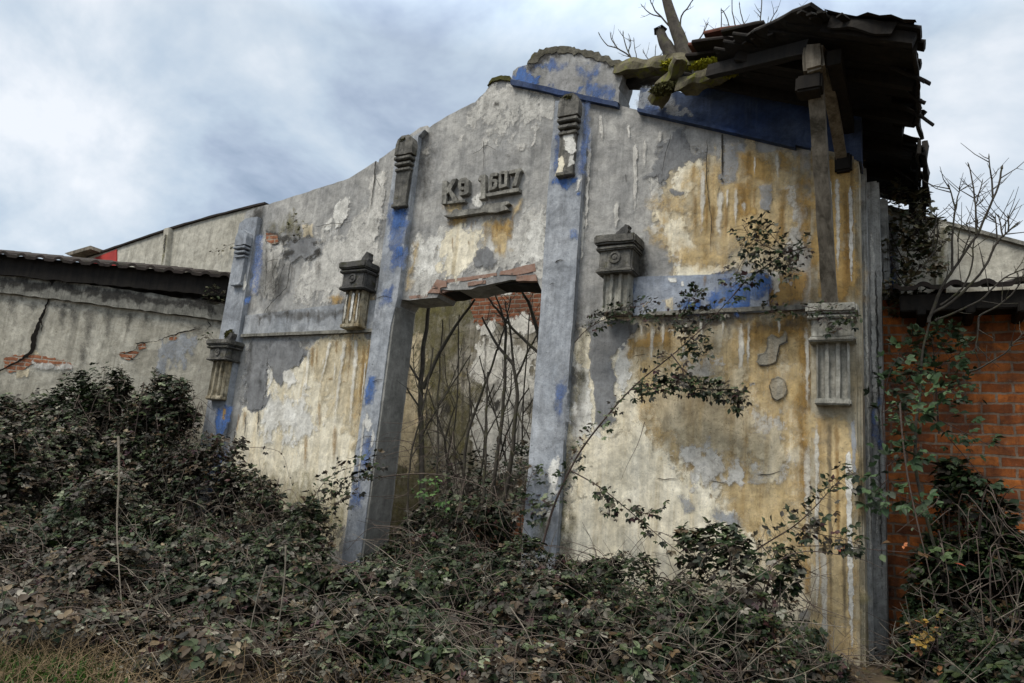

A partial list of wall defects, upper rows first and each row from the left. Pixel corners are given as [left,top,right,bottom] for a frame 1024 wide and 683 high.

peeling [243,170,546,308]
damp [700,172,745,232]
crack [0,280,54,371]
flaking render [4,349,73,377]
crack [120,322,211,360]
peeling [544,67,811,642]
damp [685,318,750,369]
peeling [208,334,375,554]
damp [804,234,896,658]